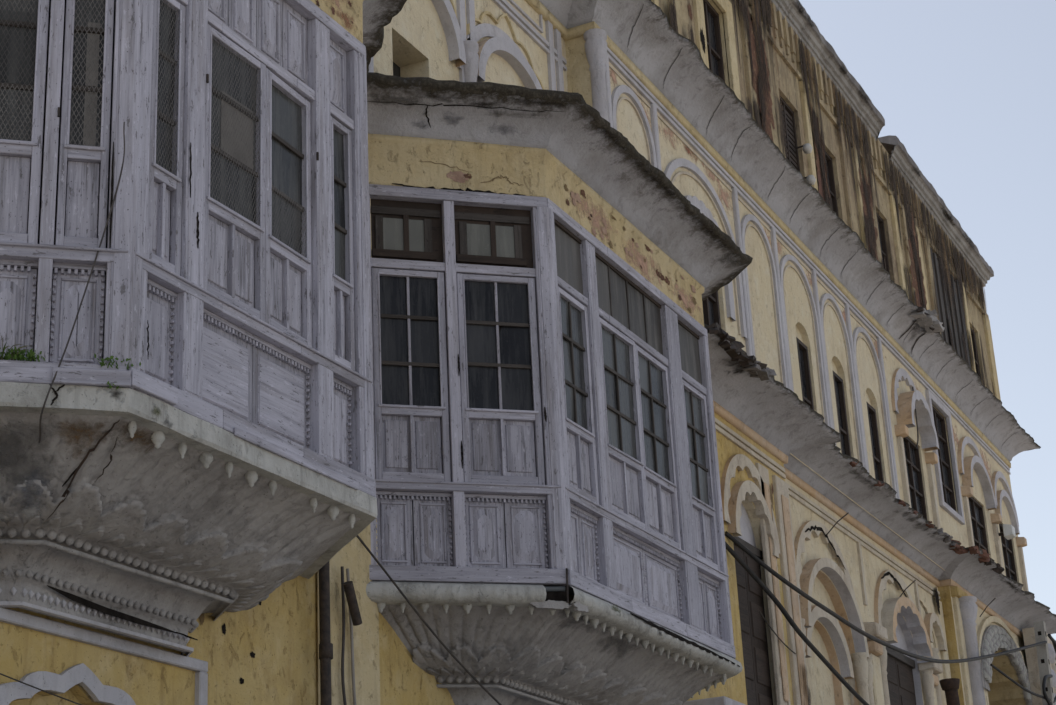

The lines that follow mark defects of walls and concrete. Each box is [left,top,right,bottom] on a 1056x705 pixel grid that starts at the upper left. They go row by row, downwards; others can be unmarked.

crack [367,101,564,128]
leakage [733,0,788,160]
leakage [794,30,833,211]
leakage [832,80,995,396]
crack [47,420,120,519]